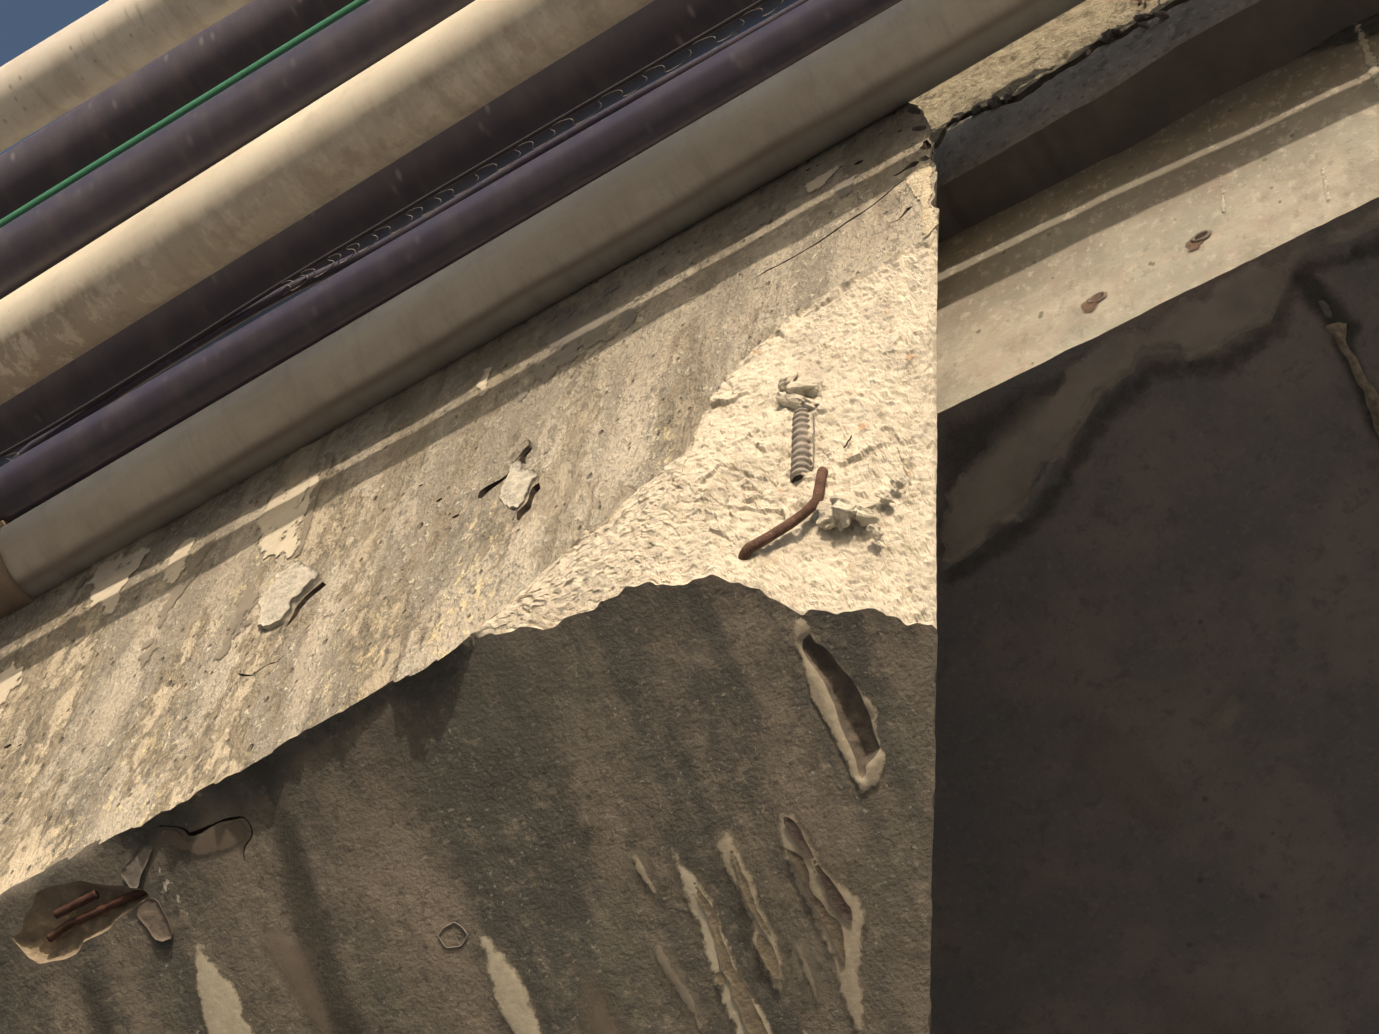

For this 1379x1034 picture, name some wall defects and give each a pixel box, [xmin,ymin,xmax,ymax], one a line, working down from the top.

crack [934,0,1186,149]
spalling [469,107,938,637]
crack [752,179,909,280]
corrosion [1081,294,1104,312]
corrosion [1186,230,1212,251]
peeling [86,547,150,615]
peeling [253,471,326,630]
damp [793,618,886,793]
spalling [12,844,174,964]
damp [176,895,254,1034]
damp [480,936,543,1034]
damp [716,813,865,1034]